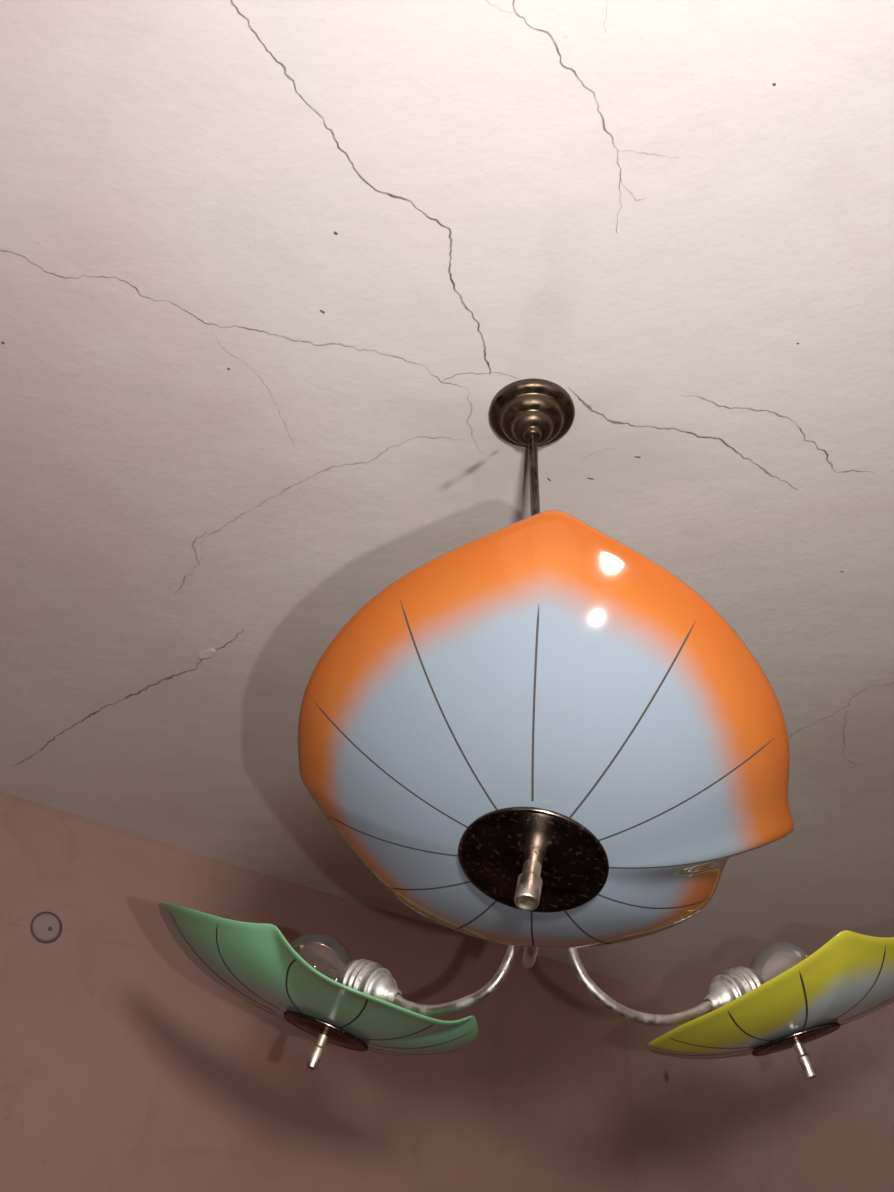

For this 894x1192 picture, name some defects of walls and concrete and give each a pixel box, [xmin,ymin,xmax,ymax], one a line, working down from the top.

crack [231,2,304,100]
crack [327,128,491,372]